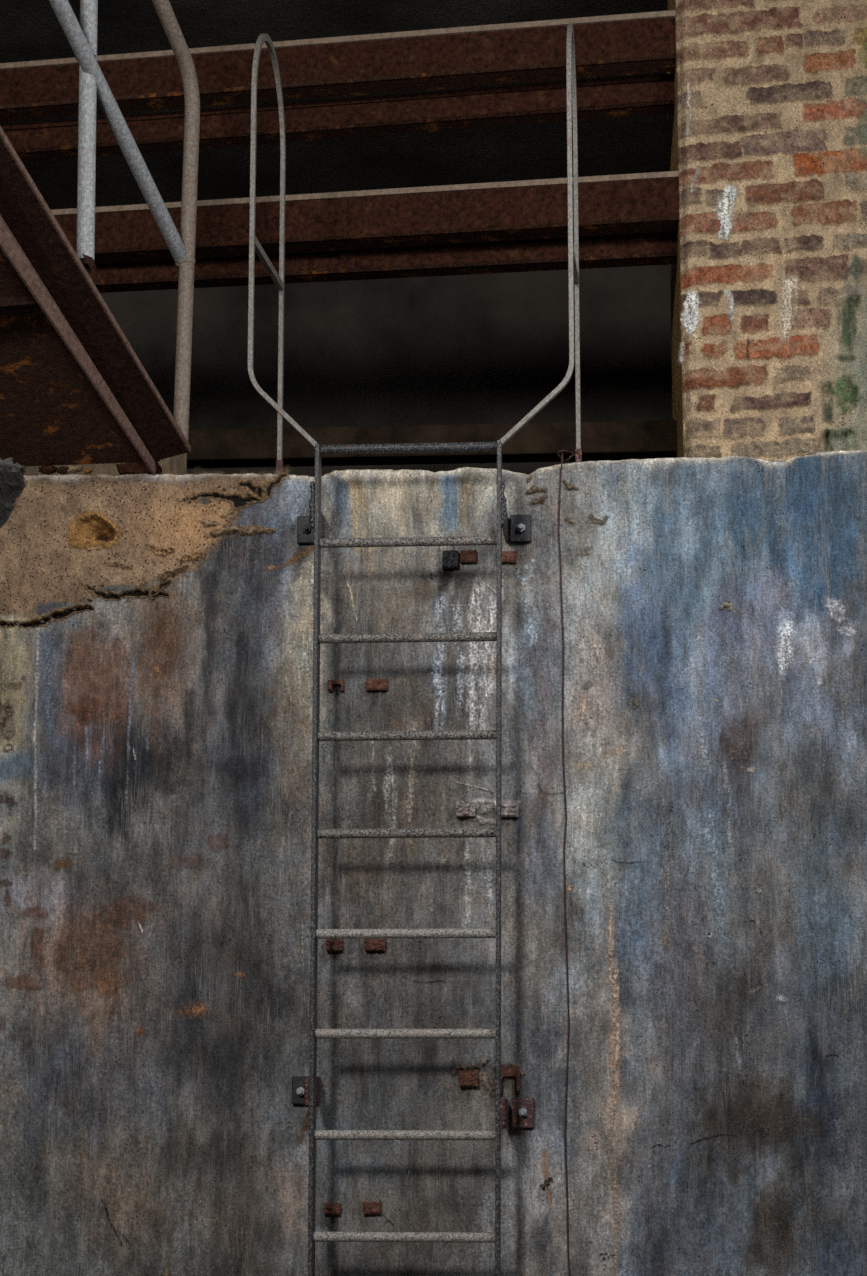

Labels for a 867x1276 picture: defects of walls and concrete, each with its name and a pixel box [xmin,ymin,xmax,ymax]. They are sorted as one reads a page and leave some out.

damp [712,185,736,239]
damp [680,291,700,361]
damp [778,277,798,341]
flaking render [0,474,278,617]
damp [282,564,323,701]
damp [776,614,797,674]
damp [826,598,855,636]
flaking render [0,643,24,752]
damp [125,571,218,798]
damp [72,727,105,797]